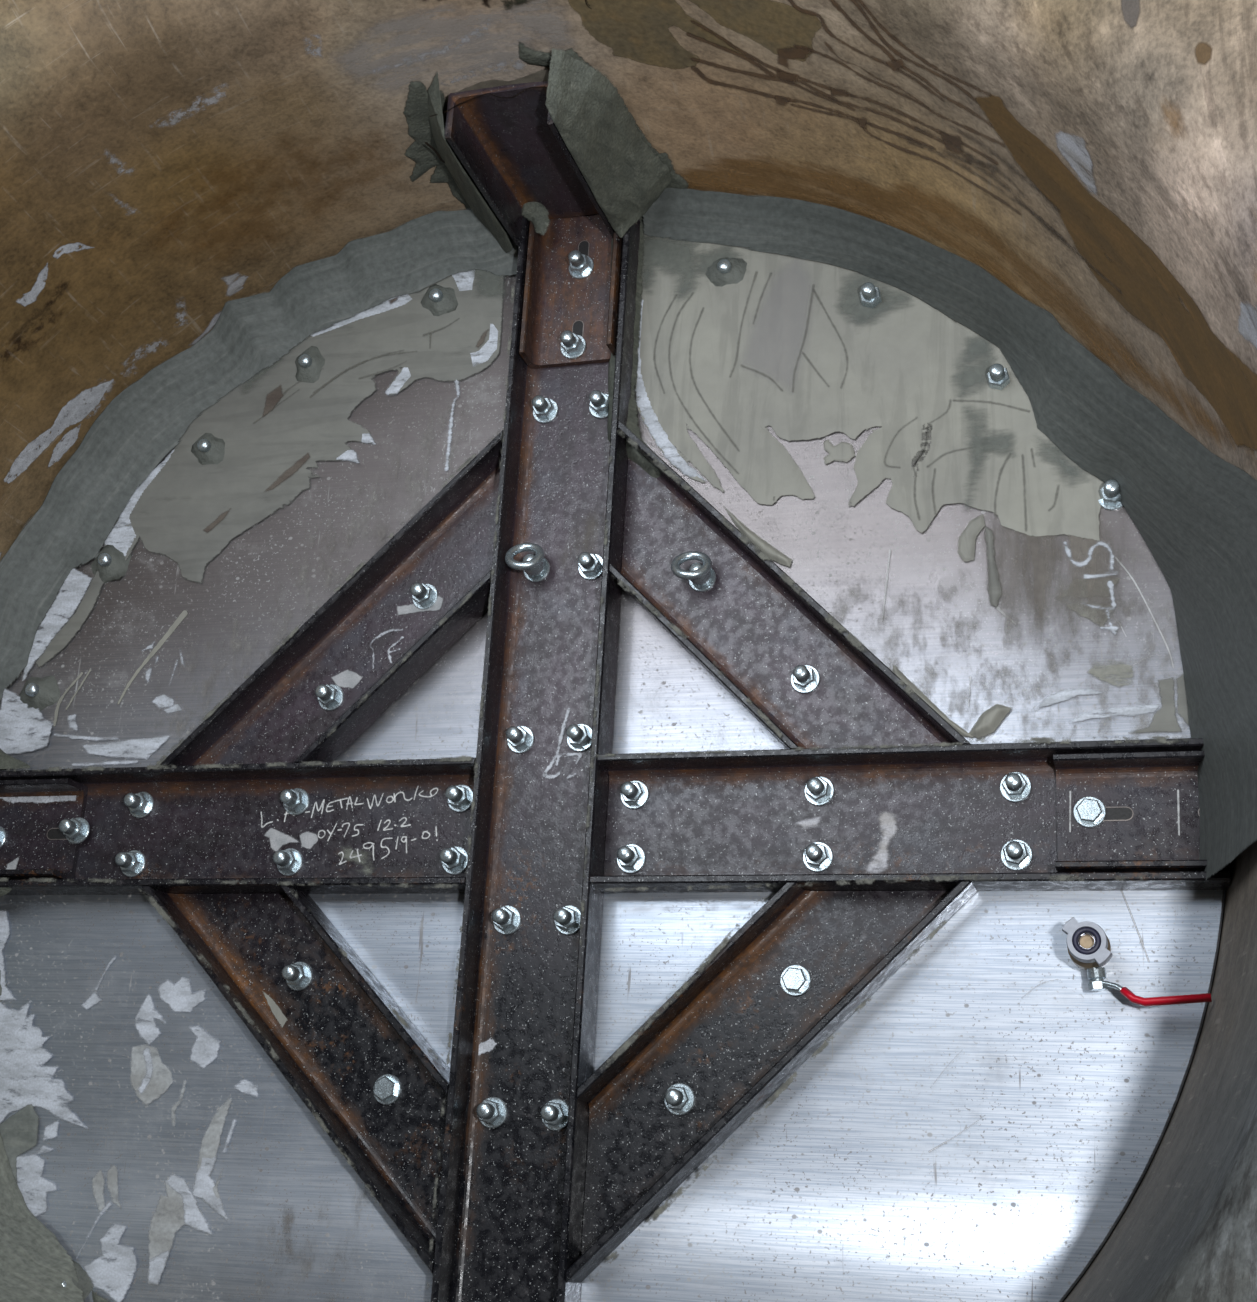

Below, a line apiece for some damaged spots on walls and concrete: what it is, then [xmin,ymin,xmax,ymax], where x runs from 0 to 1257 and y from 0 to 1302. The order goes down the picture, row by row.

rust [685,160,1218,437]
peeling [48,424,81,467]